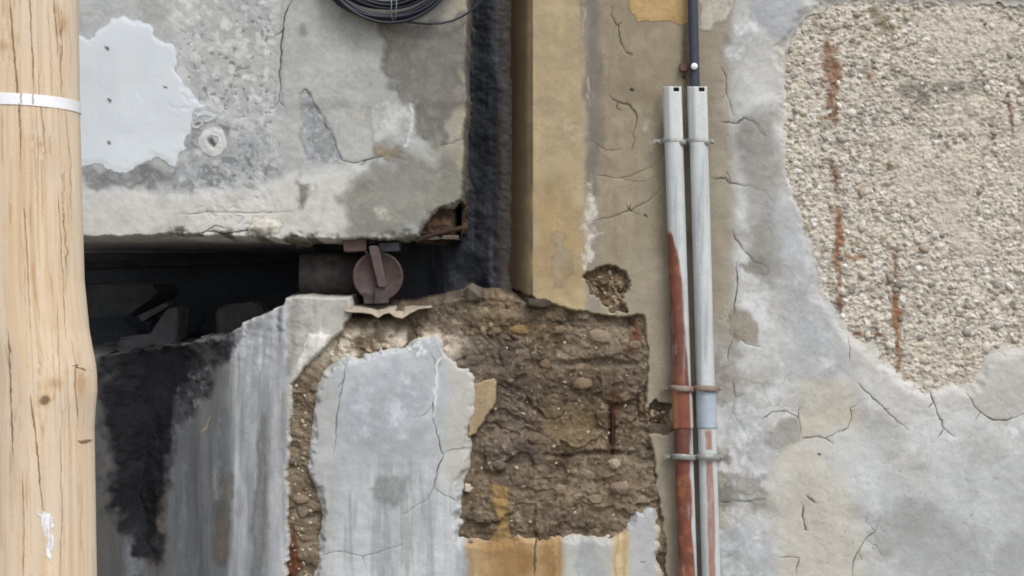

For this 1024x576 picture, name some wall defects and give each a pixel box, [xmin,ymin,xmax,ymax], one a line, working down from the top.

crack [272,0,379,165]
crack [593,88,658,221]
crack [722,70,766,136]
corrosion [822,40,840,120]
spalling [782,0,1024,396]
corrosion [833,209,864,313]
corrosion [891,249,902,373]
crack [405,398,465,514]
spalling [287,182,674,576]
crack [928,392,950,437]
crack [966,393,1020,421]
damp [123,488,167,576]